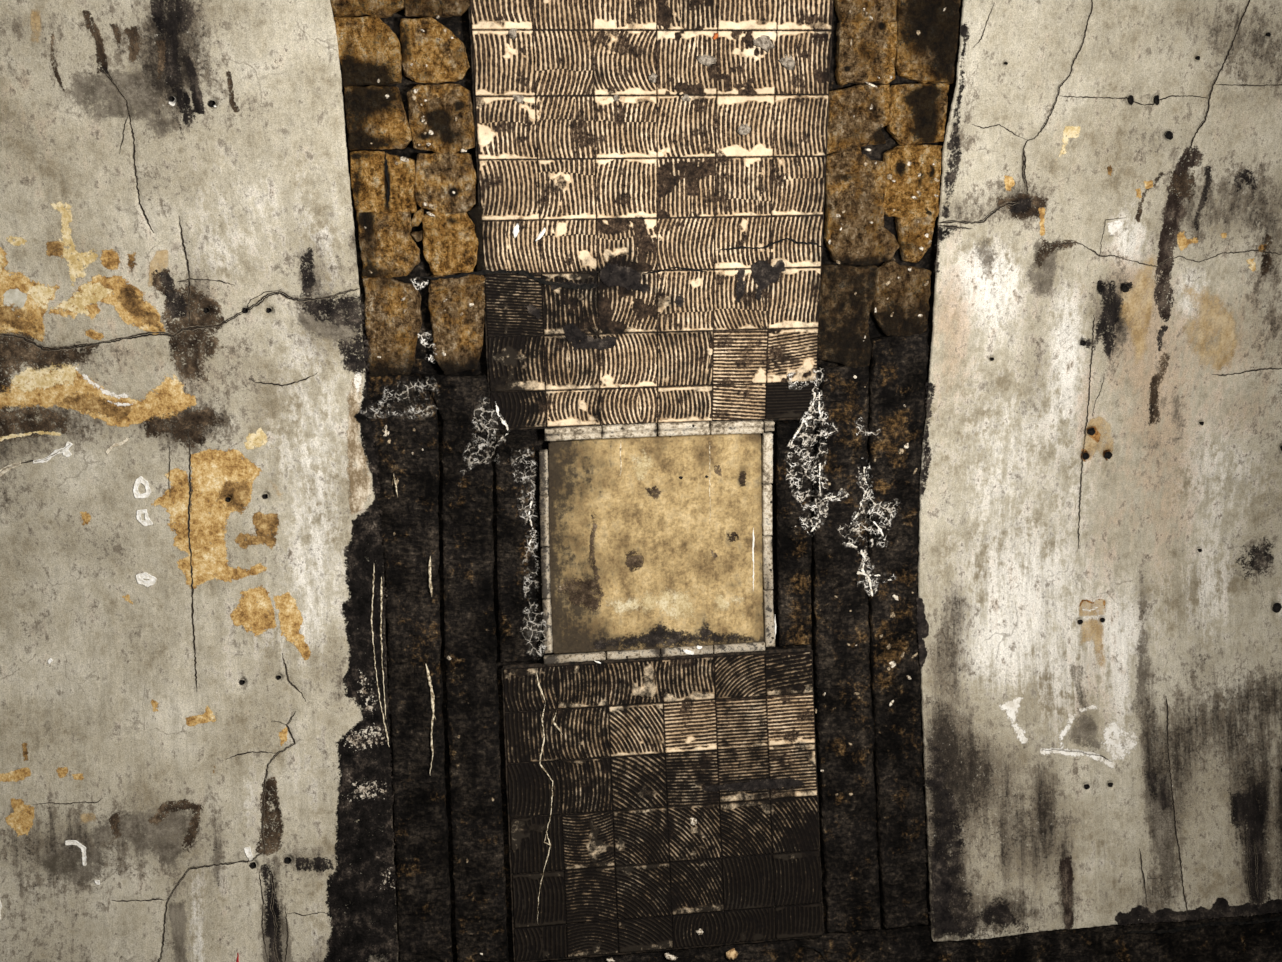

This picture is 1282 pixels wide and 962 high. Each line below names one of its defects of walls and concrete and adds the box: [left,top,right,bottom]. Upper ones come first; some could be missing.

peeling [0,202,168,342]
leakage [50,0,205,135]
crack [0,70,360,351]
crack [938,0,1282,229]
leakage [1135,146,1212,426]
peeling [0,362,197,455]
crack [168,429,197,687]
peeling [133,427,311,660]
leakage [296,247,435,962]
leakage [786,369,897,596]
crack [113,653,327,962]
leakage [255,777,293,962]